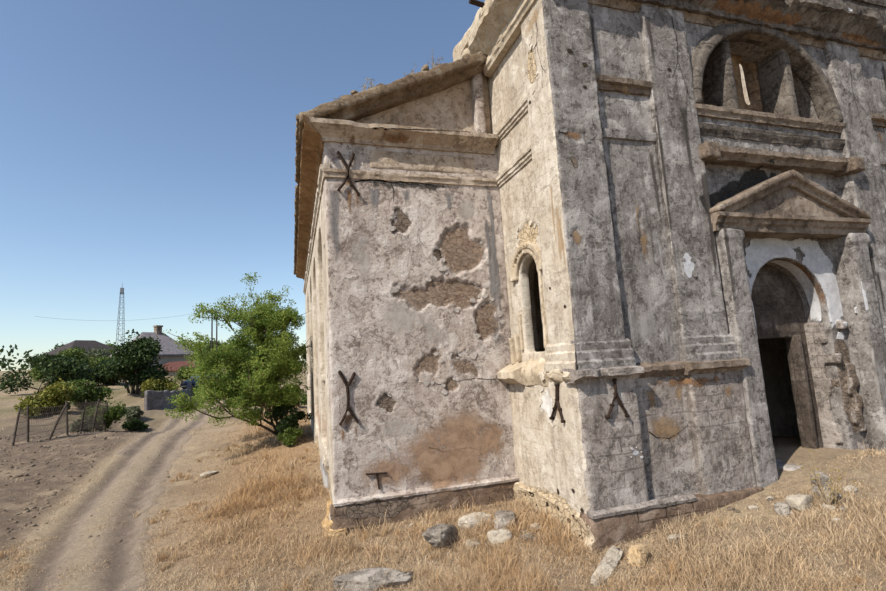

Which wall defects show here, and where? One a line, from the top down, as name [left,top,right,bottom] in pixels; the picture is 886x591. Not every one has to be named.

crack [354,178,432,202]
spalling [391,227,506,339]
flaking render [681,253,698,278]
flaking render [745,238,864,433]
spalling [415,349,482,395]
spalling [376,394,395,412]